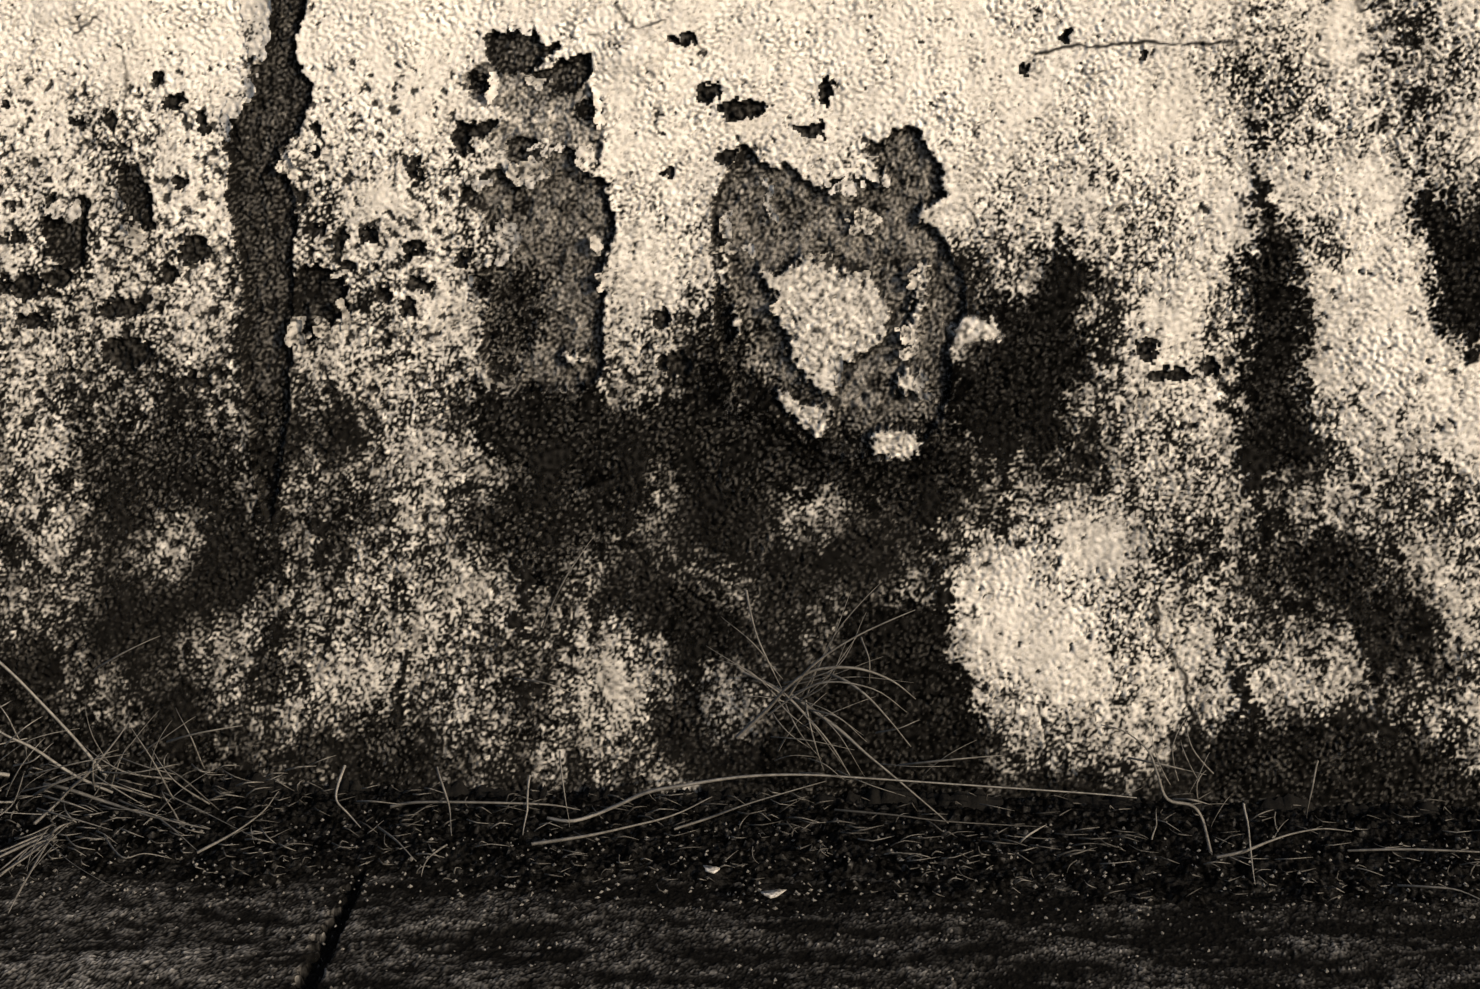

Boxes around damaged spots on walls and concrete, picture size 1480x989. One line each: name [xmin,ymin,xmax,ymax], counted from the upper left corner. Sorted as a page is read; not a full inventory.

flaking render [0,161,156,329]
peeling [68,108,117,132]
peeling [90,291,155,373]
flaking render [450,21,619,393]
flaking render [702,125,968,461]
crack [1035,39,1238,55]
damp [1149,0,1480,808]
damp [53,395,373,714]
damp [465,219,1104,798]
damp [0,644,237,787]
damp [352,607,427,792]